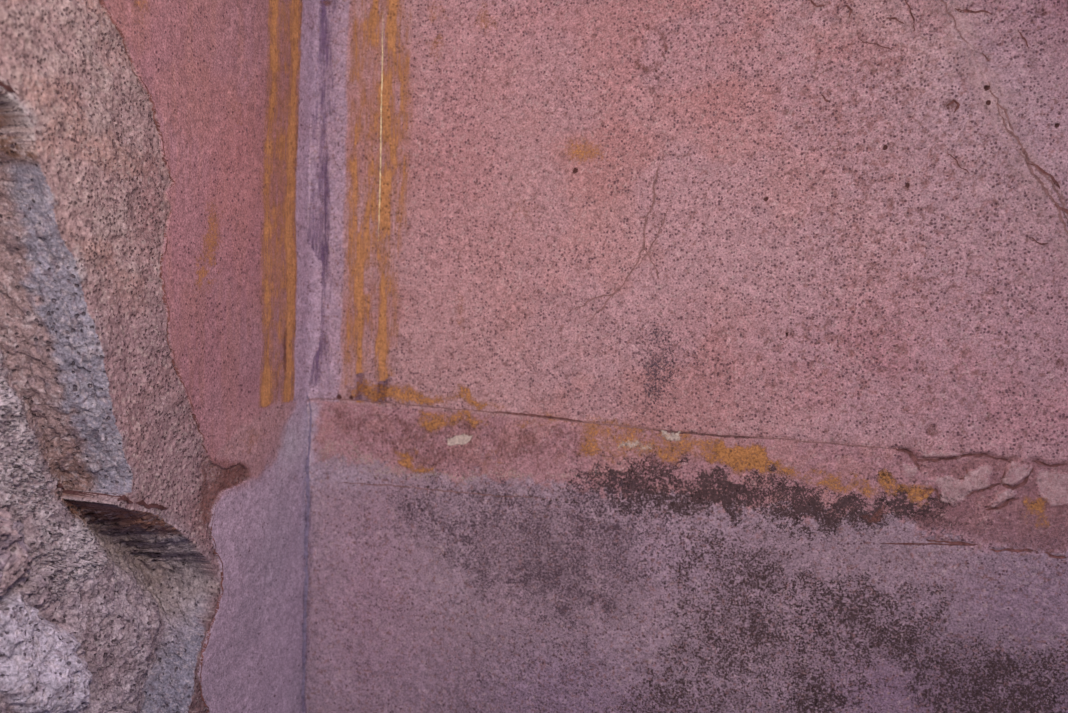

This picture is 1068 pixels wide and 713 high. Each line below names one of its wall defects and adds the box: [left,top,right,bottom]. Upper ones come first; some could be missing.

crack [940,0,973,44]
crack [988,81,1068,234]
flaking render [0,0,249,713]
crack [301,394,1011,713]
leakage [379,423,1068,713]
peeling [896,448,1068,559]